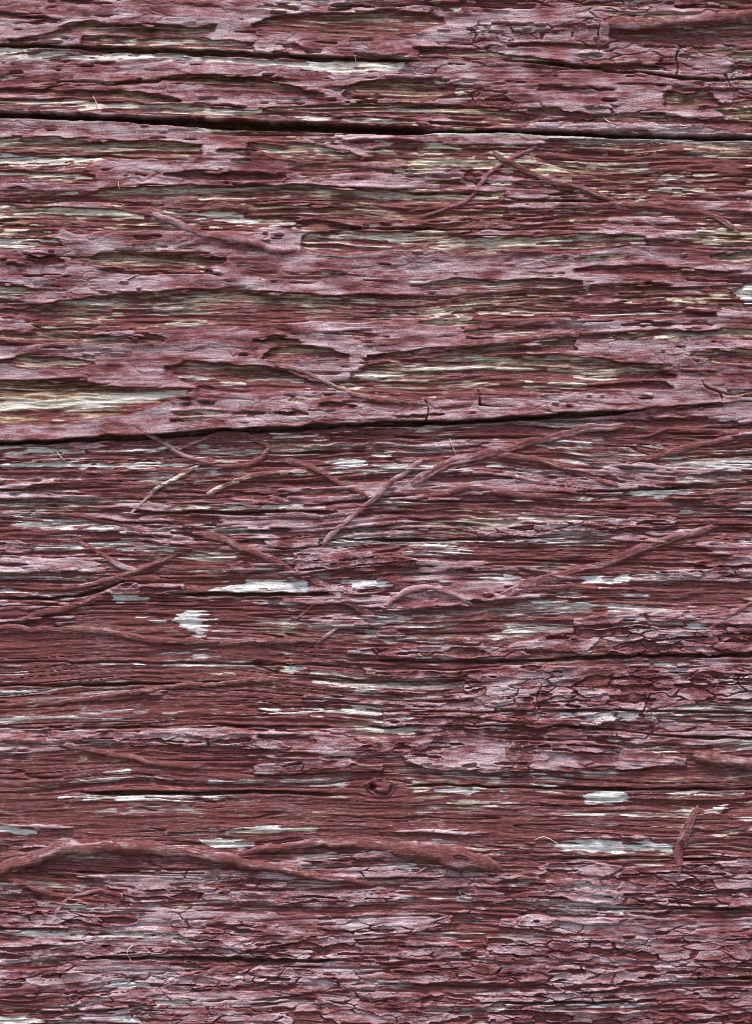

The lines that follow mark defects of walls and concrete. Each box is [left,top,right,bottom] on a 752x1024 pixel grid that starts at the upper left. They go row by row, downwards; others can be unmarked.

peeling [0,22,752,131]
crack [501,49,752,82]
peeling [0,137,645,254]
peeling [0,236,225,271]
peeling [0,251,752,424]
crack [0,390,649,454]
peeling [208,577,311,594]
peeling [171,610,219,640]
crack [0,610,752,796]
peeling [583,788,630,805]
peeling [550,839,674,854]
crack [0,856,752,1024]